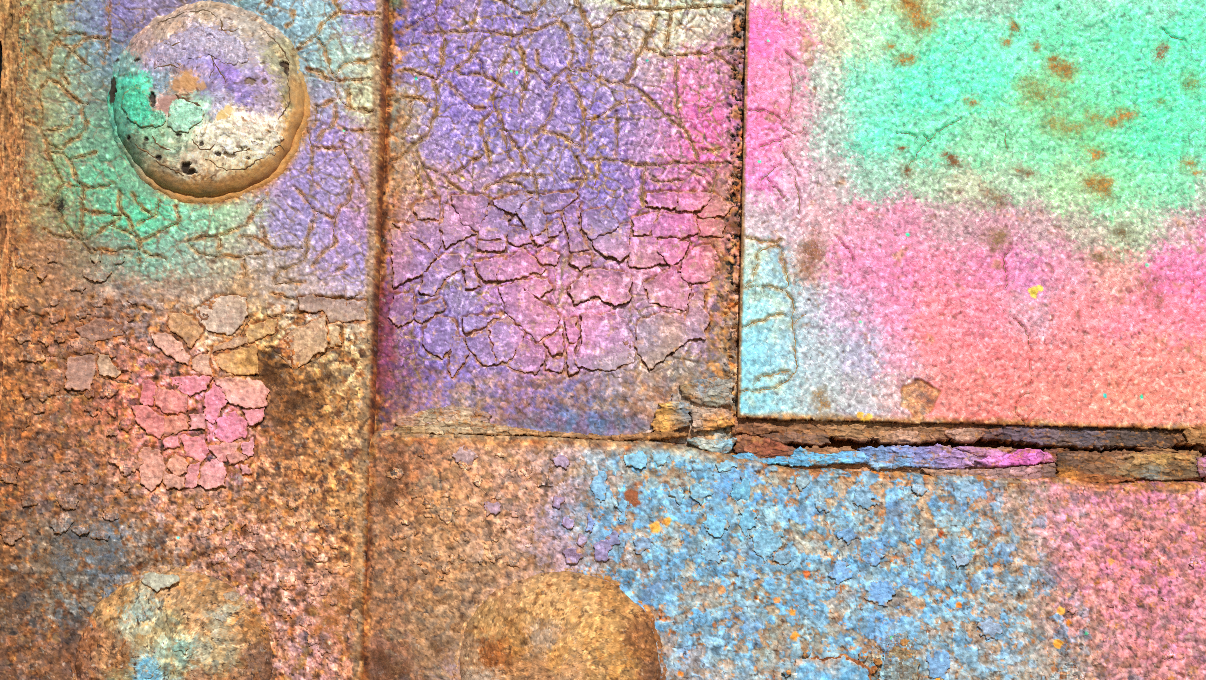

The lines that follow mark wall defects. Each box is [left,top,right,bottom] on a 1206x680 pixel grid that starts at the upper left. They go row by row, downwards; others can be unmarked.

rust [1021,43,1137,133]
crack [28,0,735,371]
rust [12,250,132,373]
peeling [64,317,124,392]
peeling [131,294,367,491]
rust [49,467,119,568]
rust [193,496,351,655]
rust [379,451,536,580]
rust [625,489,640,506]
peeling [391,377,1206,565]
peeling [828,527,896,607]
peeling [926,648,950,680]